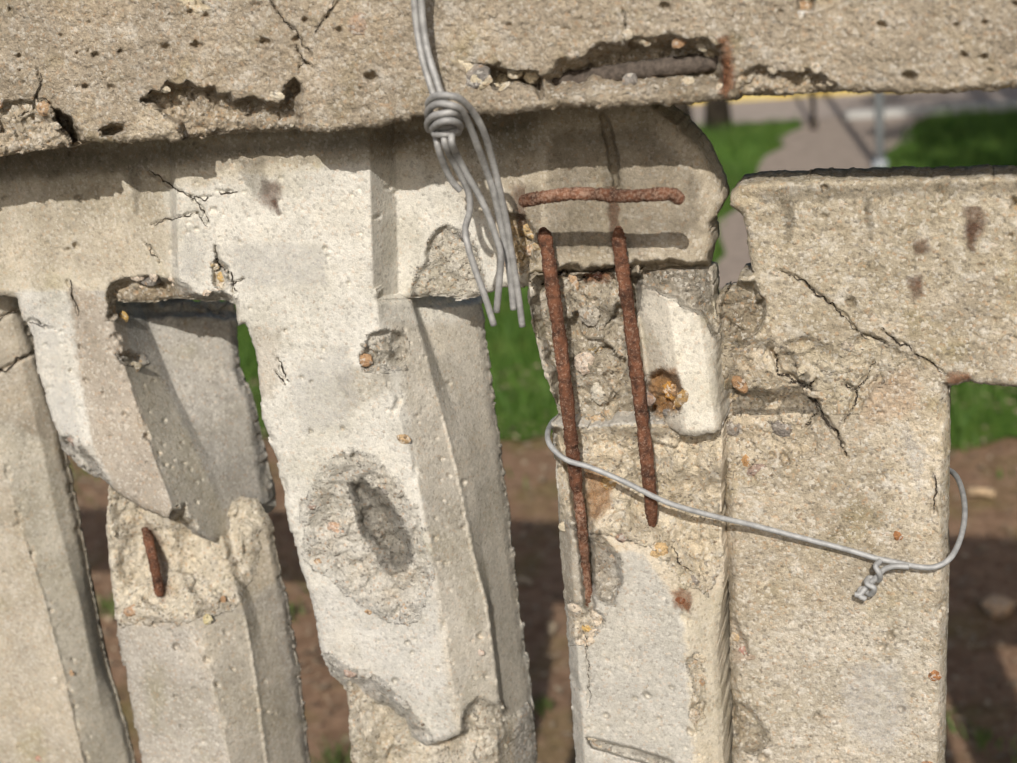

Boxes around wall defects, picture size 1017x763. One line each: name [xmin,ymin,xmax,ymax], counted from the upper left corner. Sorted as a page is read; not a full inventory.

crack [269,0,334,68]
spalling [458,28,841,100]
corrosion [719,38,733,94]
spalling [131,75,305,139]
crack [146,171,243,291]
corrosion [650,369,681,410]
spalling [500,187,922,648]
crack [774,271,946,456]
corrosion [586,470,609,518]
spalling [61,435,267,629]
spalling [299,446,435,627]
corrosion [674,589,690,610]